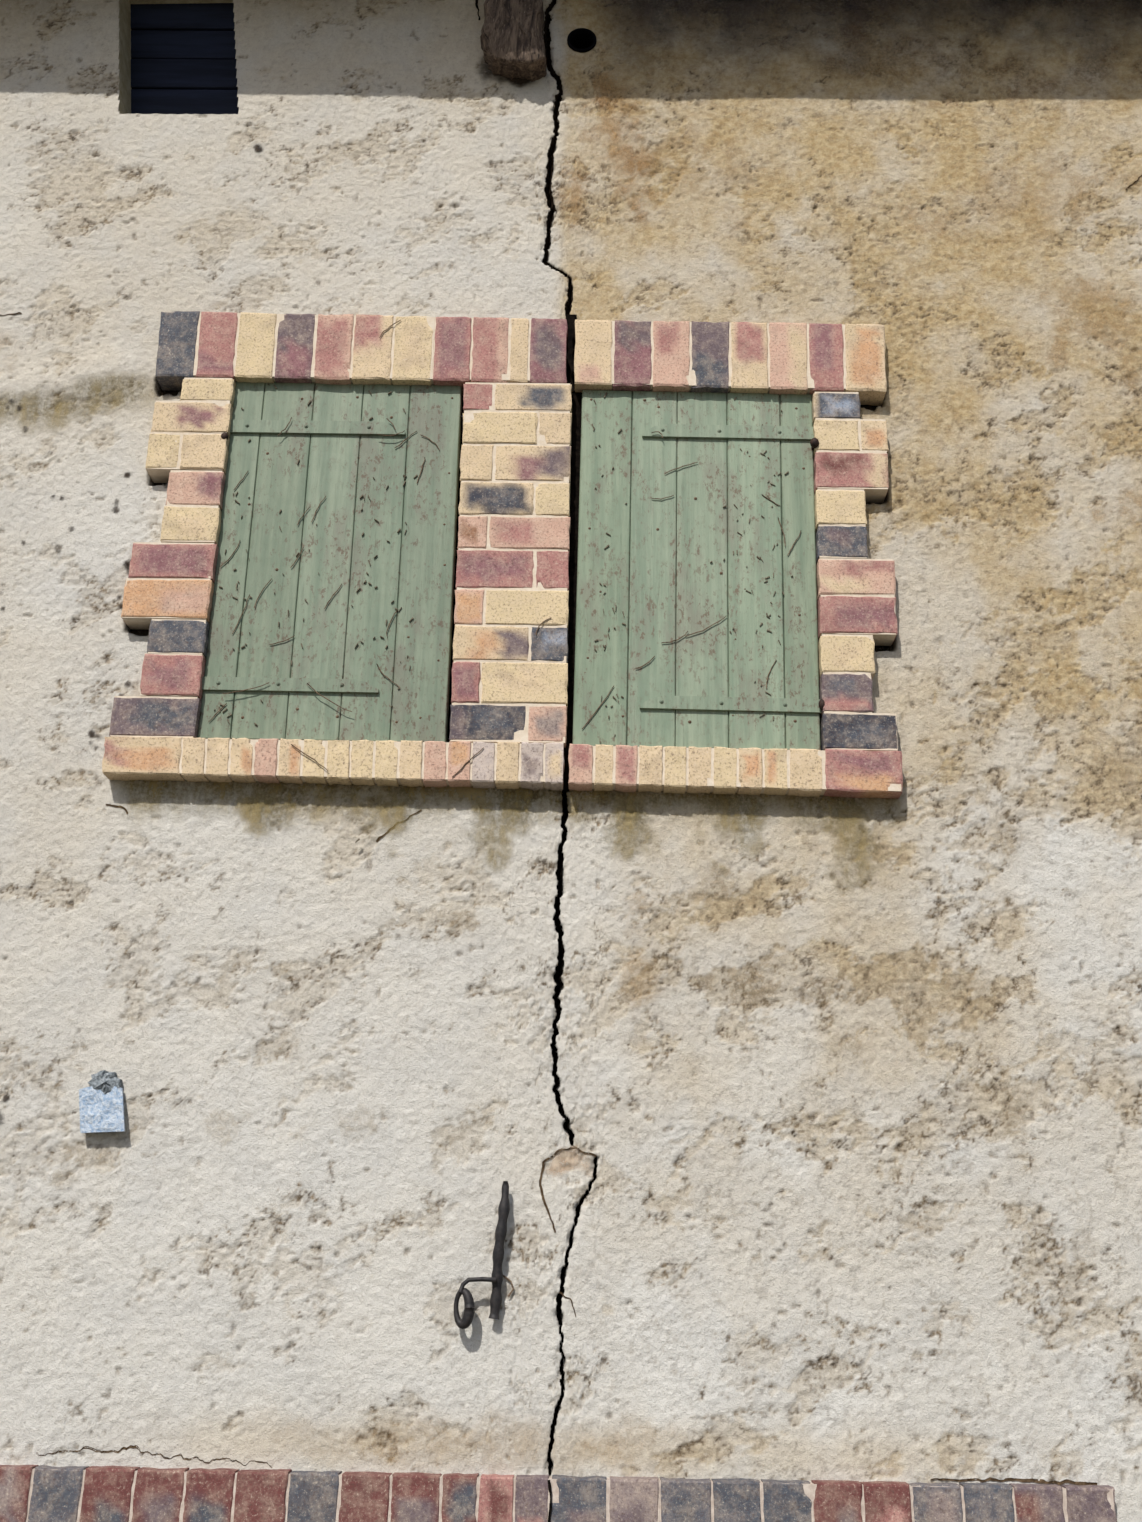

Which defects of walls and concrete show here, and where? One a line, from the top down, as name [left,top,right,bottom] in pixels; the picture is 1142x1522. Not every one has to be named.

crack [539,0,598,1522]